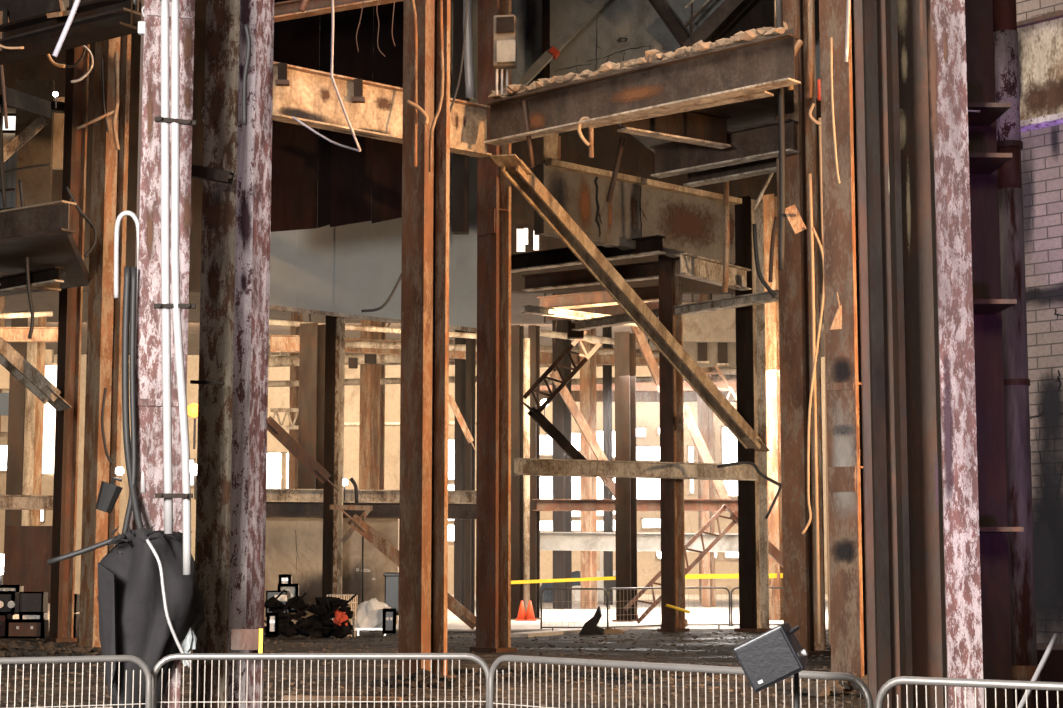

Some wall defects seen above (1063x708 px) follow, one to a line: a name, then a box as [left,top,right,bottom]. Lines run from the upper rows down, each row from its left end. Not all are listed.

rust [920,0,947,144]
rust [378,98,392,109]
rust [618,86,657,101]
rust [661,203,713,244]
rust [208,267,219,304]